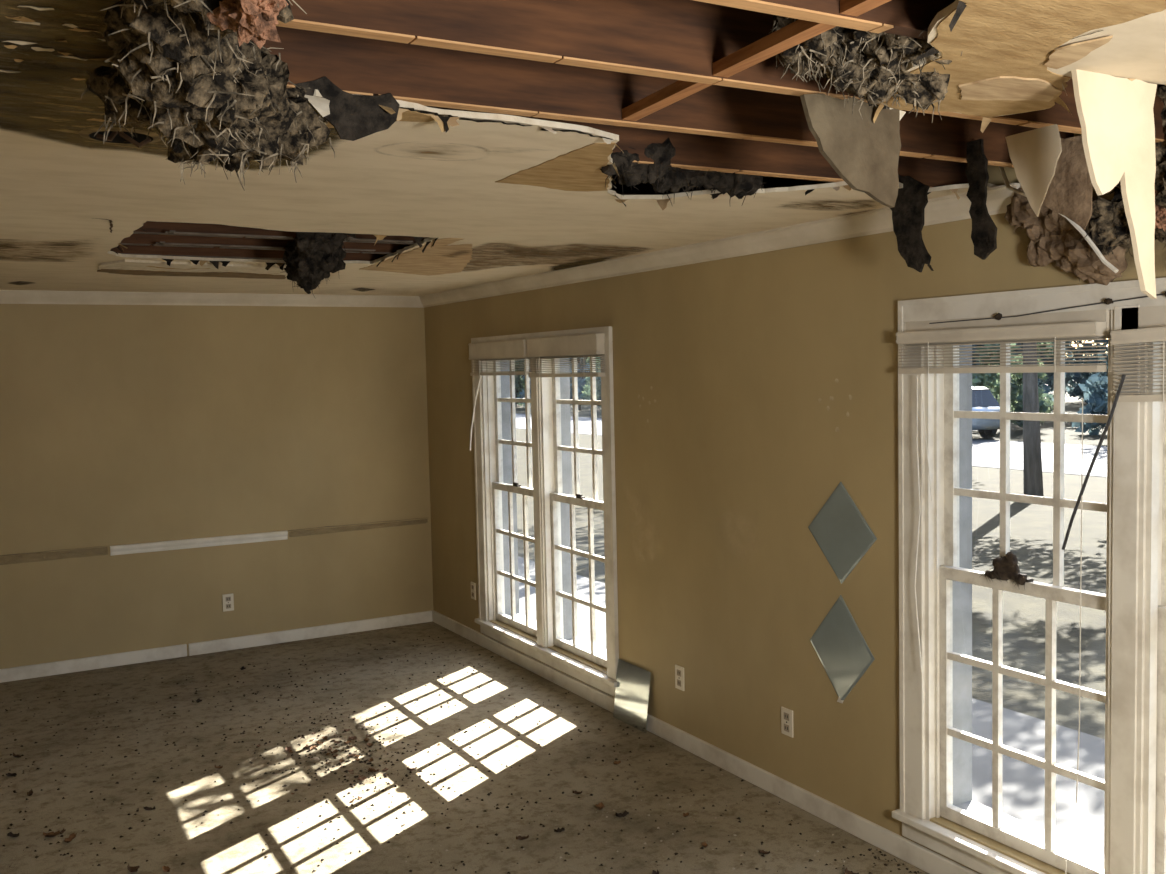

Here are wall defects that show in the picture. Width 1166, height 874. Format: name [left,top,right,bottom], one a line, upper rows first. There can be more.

spalling [949,0,967,31]
water stain [0,0,169,156]
water stain [244,101,340,170]
spalling [304,95,330,117]
spalling [379,105,629,207]
spalling [873,103,906,123]